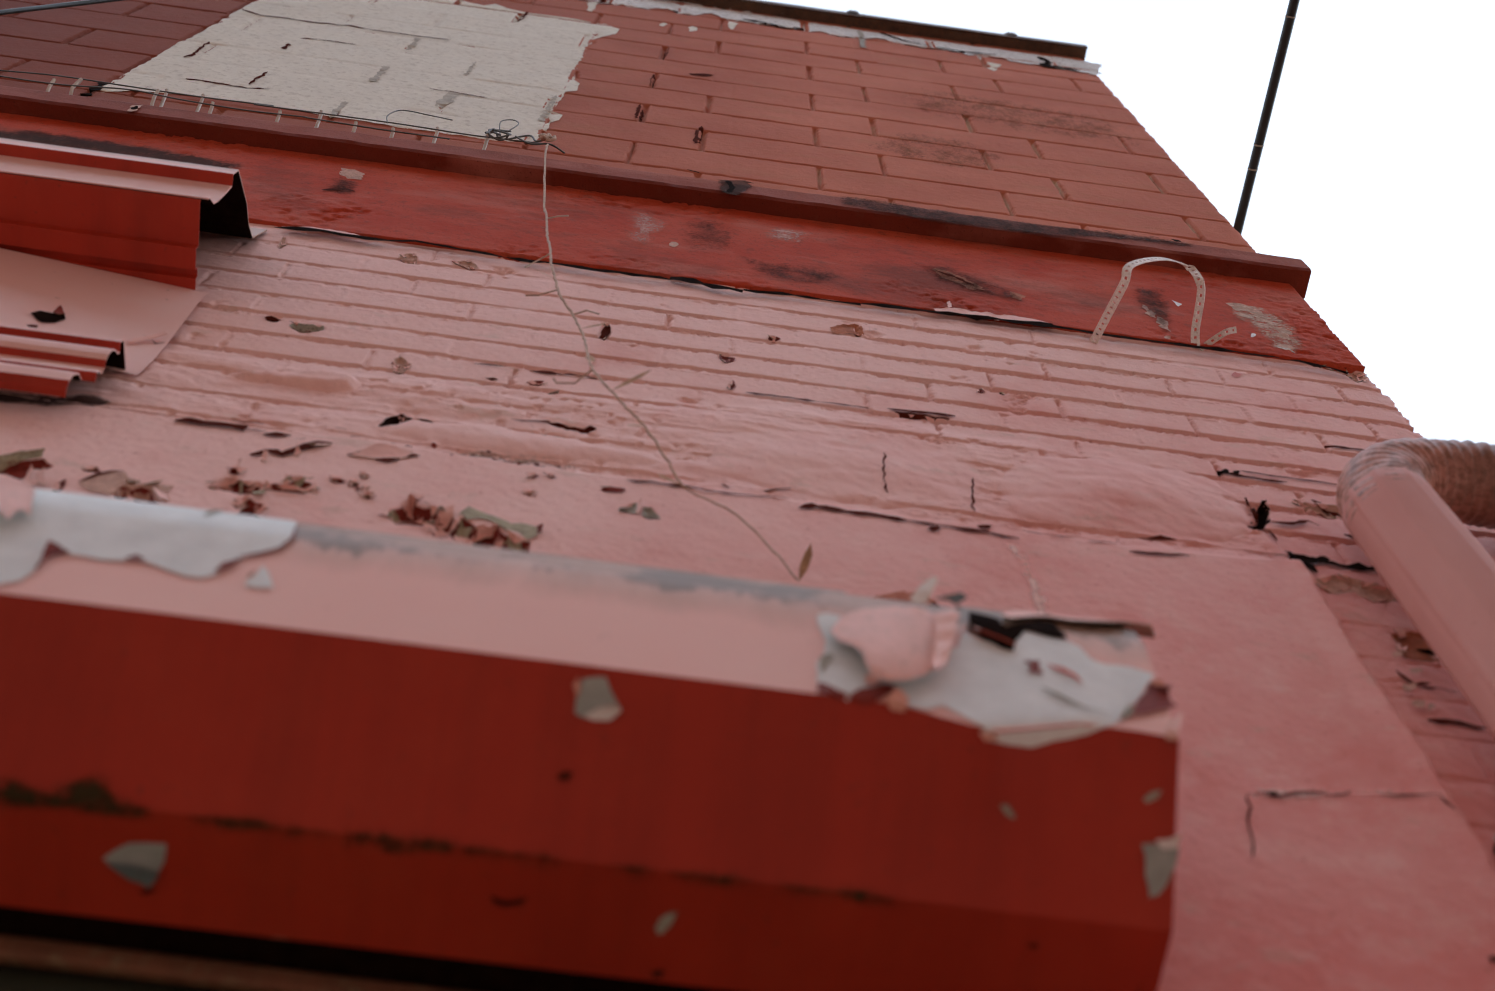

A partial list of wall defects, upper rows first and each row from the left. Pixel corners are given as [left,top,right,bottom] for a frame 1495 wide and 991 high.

peeling [0,414,560,588]
peeling [573,677,622,721]
peeling [816,576,1182,748]
spalling [1391,629,1486,729]
leakage [0,778,148,816]
peeling [103,843,167,895]
peeling [1142,834,1182,898]